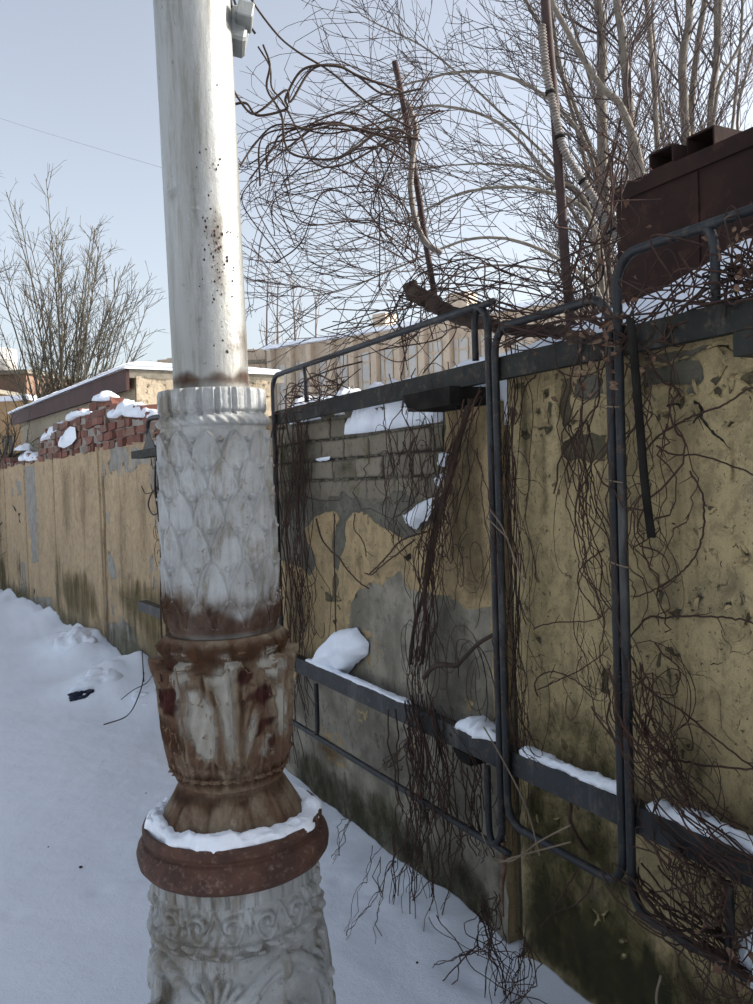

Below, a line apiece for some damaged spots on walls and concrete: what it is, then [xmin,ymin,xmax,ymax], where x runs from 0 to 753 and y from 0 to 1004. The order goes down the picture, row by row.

rust [168,766,235,805]
rust [155,588,290,754]
spalling [269,409,494,722]
spalling [285,674,509,944]